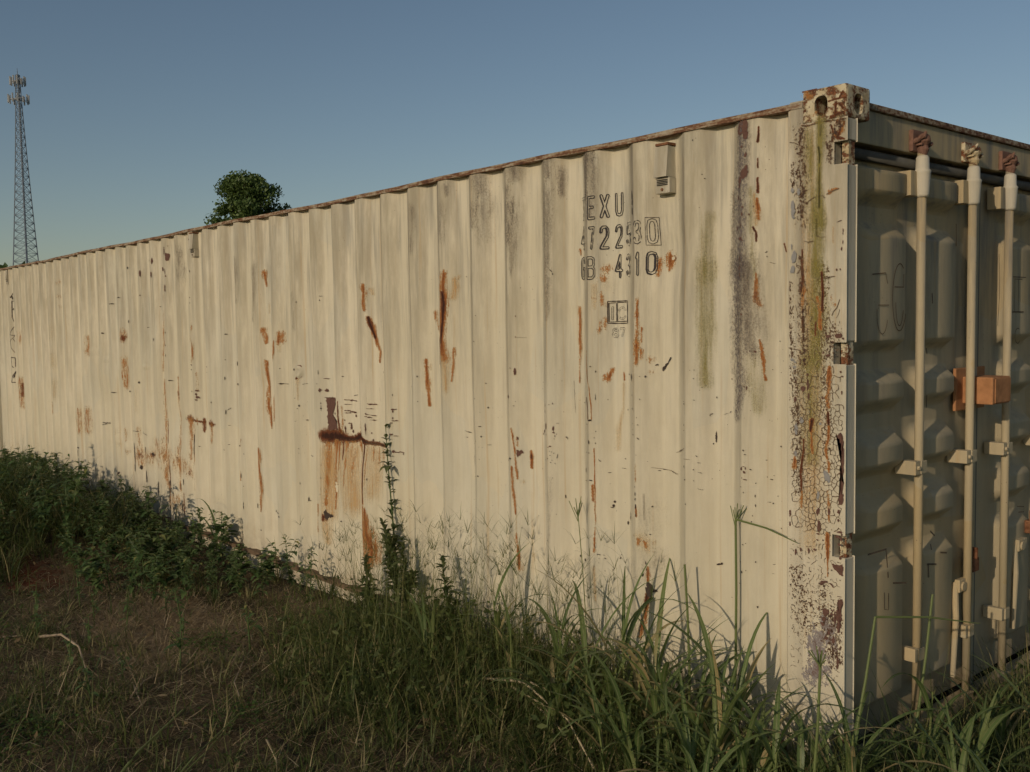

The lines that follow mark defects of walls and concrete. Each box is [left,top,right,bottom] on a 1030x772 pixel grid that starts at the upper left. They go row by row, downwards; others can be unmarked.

rust [802,88,846,141]
rust [125,377,215,516]
rust [260,327,286,428]
rust [317,401,386,568]
rust [360,283,382,363]
rust [424,359,432,407]
rust [433,270,457,389]
water stain [732,122,755,418]
rust [752,158,761,242]
peeling [780,244,844,687]
crack [790,235,844,683]
water stain [812,131,823,276]